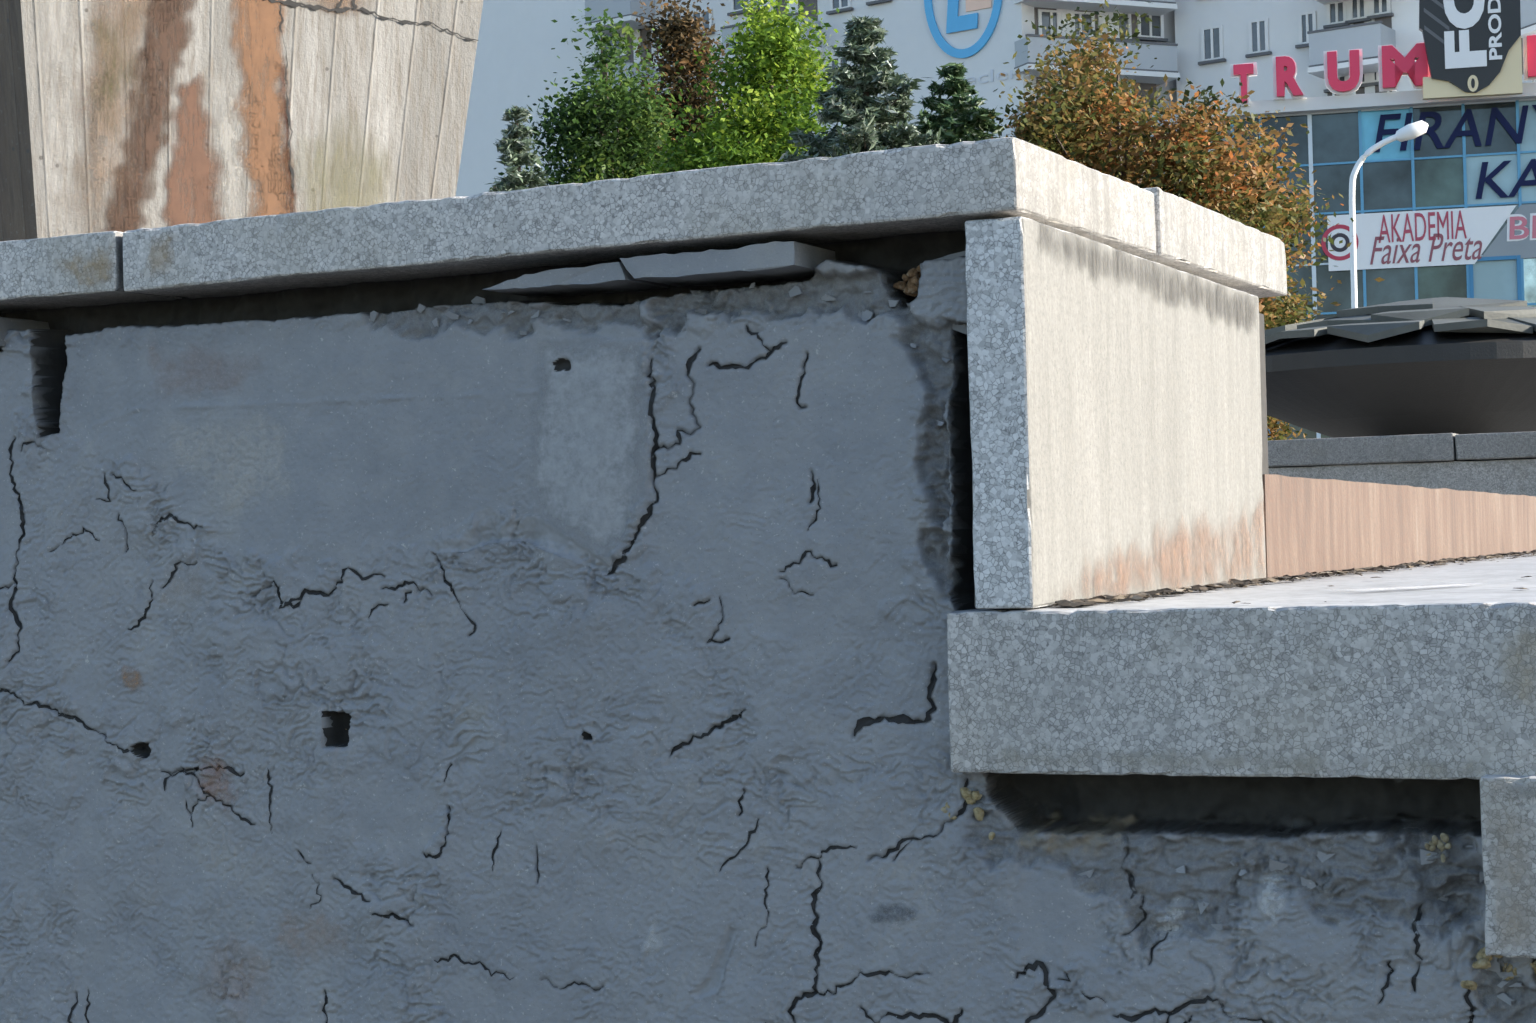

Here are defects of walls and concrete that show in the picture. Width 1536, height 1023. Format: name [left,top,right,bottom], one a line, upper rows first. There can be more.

corrosion [105,0,222,232]
corrosion [233,0,296,217]
corrosion [323,0,358,8]
crack [269,0,479,203]
spalling [370,241,967,513]
crack [607,325,808,575]
crack [0,439,413,926]
spalling [322,711,352,747]
crack [720,778,968,1023]
crack [1016,960,1266,1023]
spalling [1077,822,1377,936]
spalling [1478,956,1523,1022]